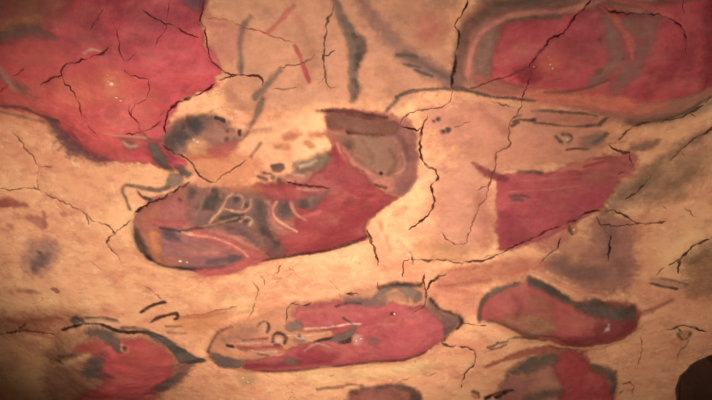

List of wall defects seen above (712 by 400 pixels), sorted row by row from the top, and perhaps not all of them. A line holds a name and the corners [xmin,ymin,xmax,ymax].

crack [0,1,294,264]
crack [279,15,336,88]
crack [400,0,468,230]
crack [443,0,591,245]
crack [609,97,712,175]
crack [402,184,666,312]
crack [657,239,709,275]